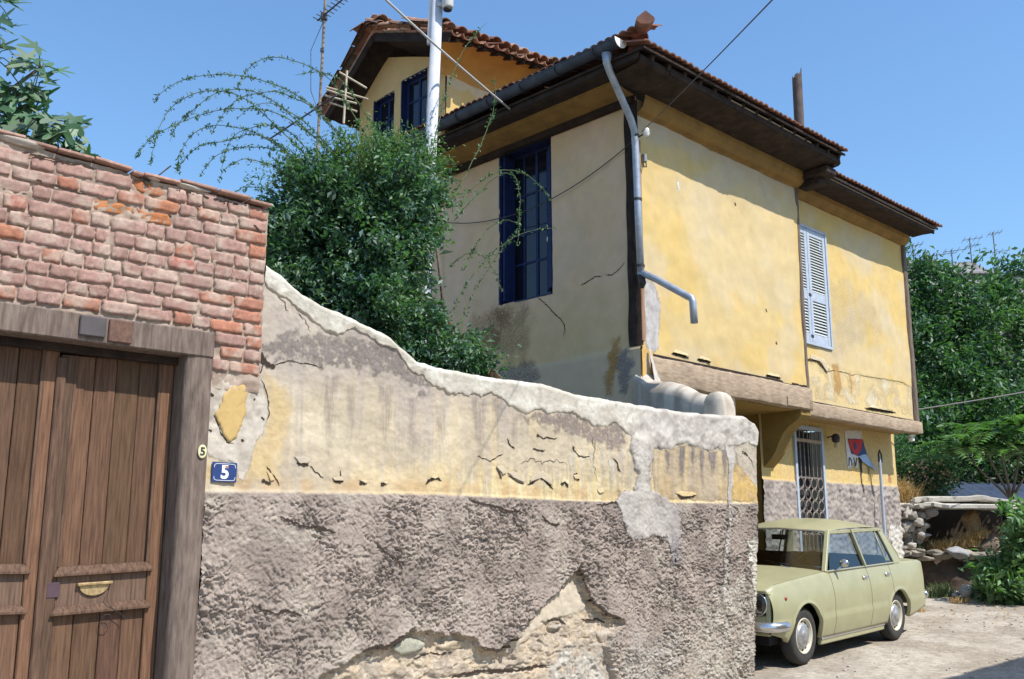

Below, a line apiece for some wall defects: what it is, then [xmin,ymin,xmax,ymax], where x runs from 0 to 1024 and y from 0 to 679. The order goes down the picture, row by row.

crack [260,352,318,373]
damp [606,338,633,395]
peeling [207,373,270,480]
damp [524,412,626,479]
damp [652,445,737,501]
flaking render [318,564,623,679]